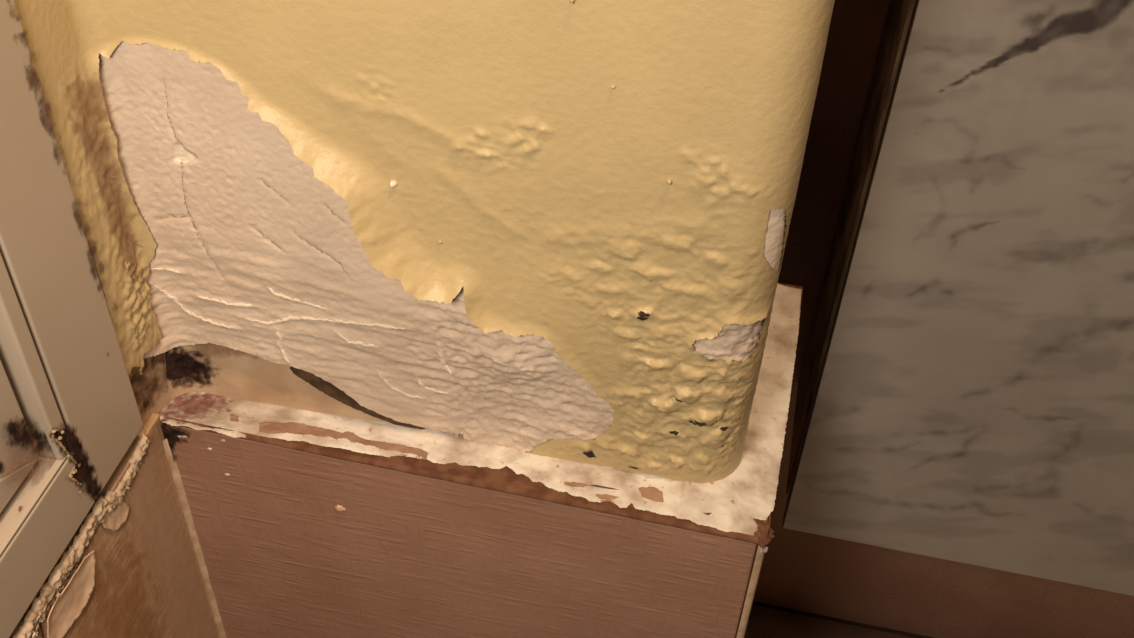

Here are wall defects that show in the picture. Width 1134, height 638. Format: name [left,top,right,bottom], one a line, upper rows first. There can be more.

peeling [71,15,627,451]
mould [6,418,106,499]
leakage [131,343,246,460]
spalling [753,521,775,553]